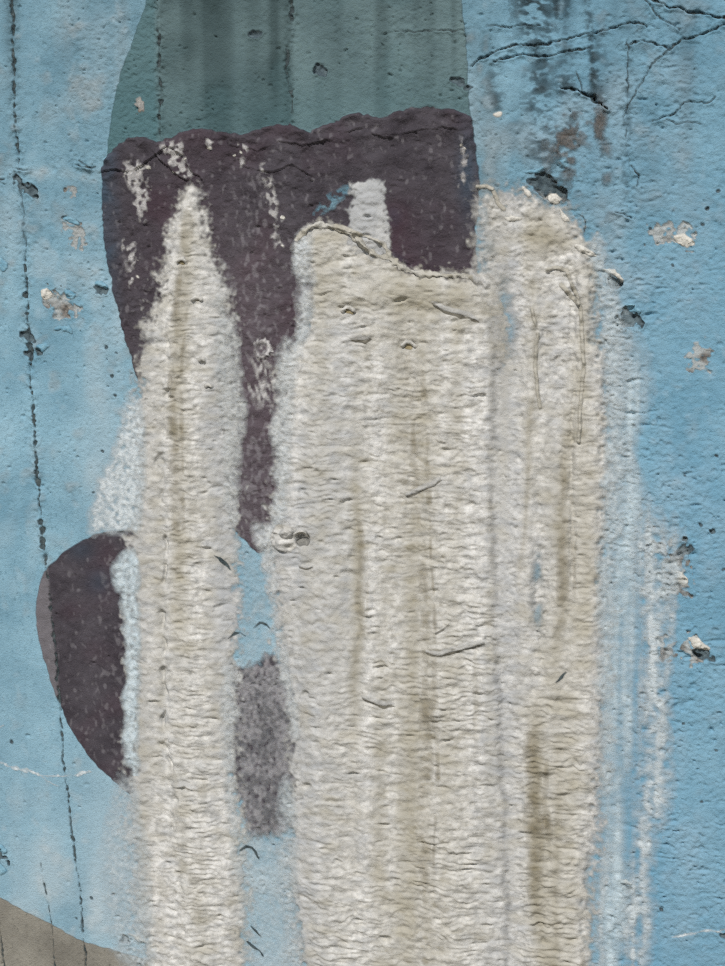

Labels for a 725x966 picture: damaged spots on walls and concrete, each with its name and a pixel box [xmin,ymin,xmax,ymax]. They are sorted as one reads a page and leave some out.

crack [479,0,725,110]
spalling [648,221,697,252]
spalling [41,288,83,334]
spalling [684,342,714,373]
spalling [645,631,715,668]